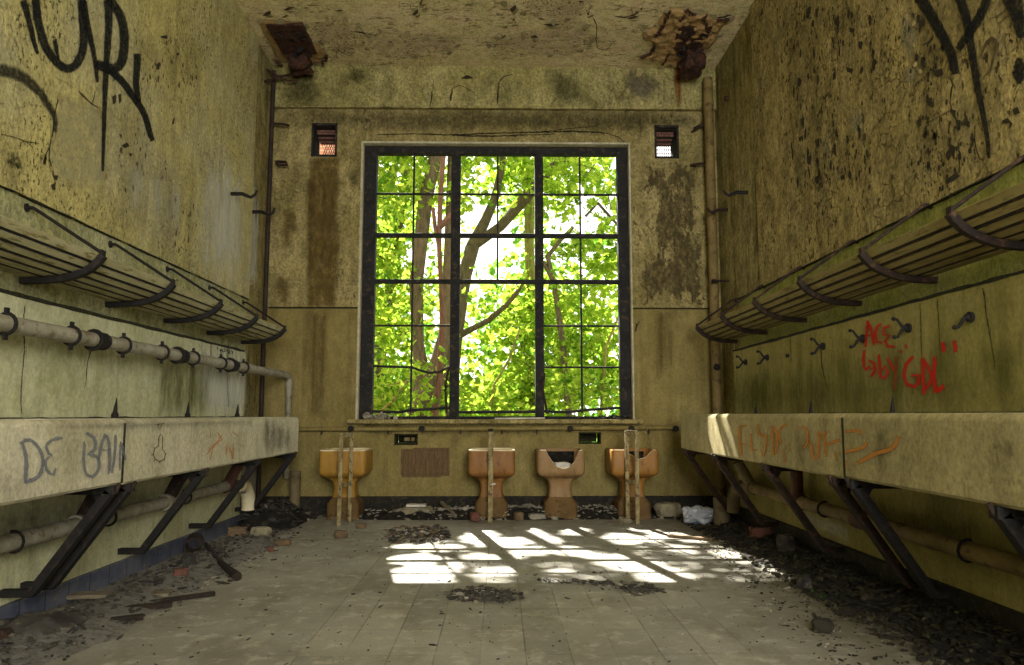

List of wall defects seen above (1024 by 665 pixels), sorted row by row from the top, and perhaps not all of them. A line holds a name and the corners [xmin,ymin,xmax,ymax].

spalling [257,7,461,83]
spalling [623,6,735,106]
leakage [307,158,339,306]